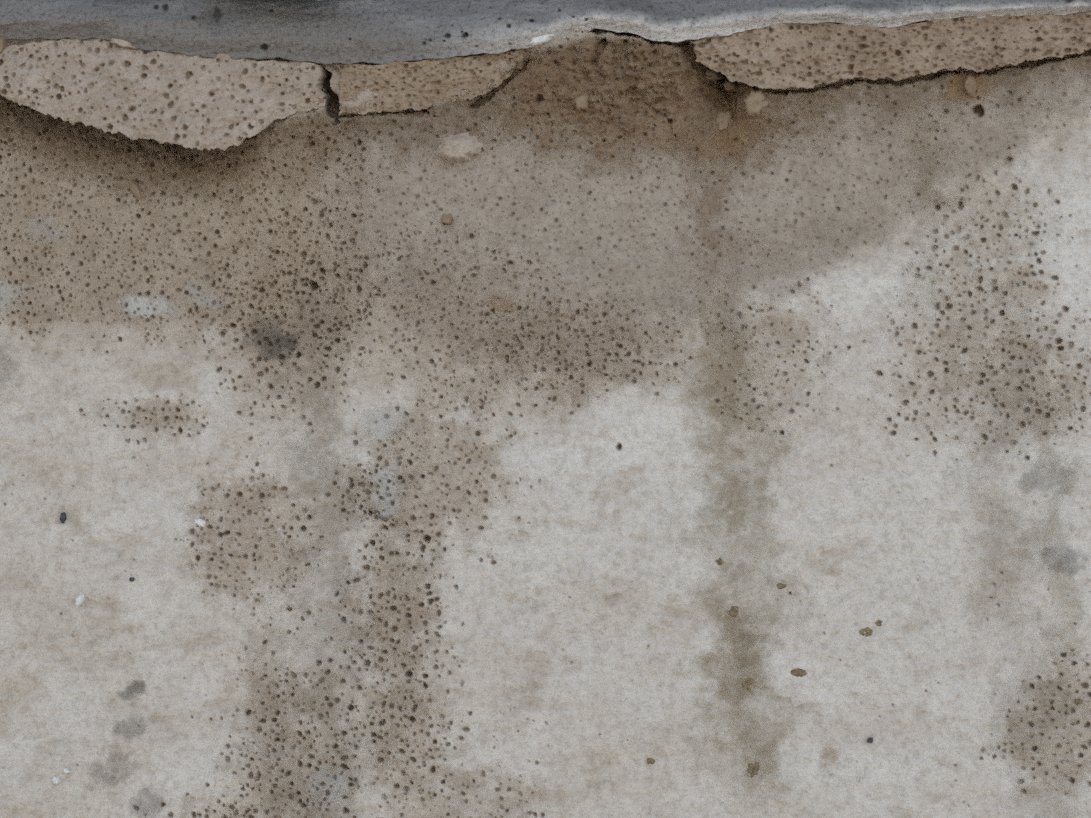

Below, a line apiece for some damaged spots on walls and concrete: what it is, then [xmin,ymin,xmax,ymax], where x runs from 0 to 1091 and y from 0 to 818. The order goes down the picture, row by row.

crack [590,29,694,67]
crack [322,71,435,122]
crack [470,61,528,108]
crack [721,49,1091,95]
leakage [125,297,174,317]